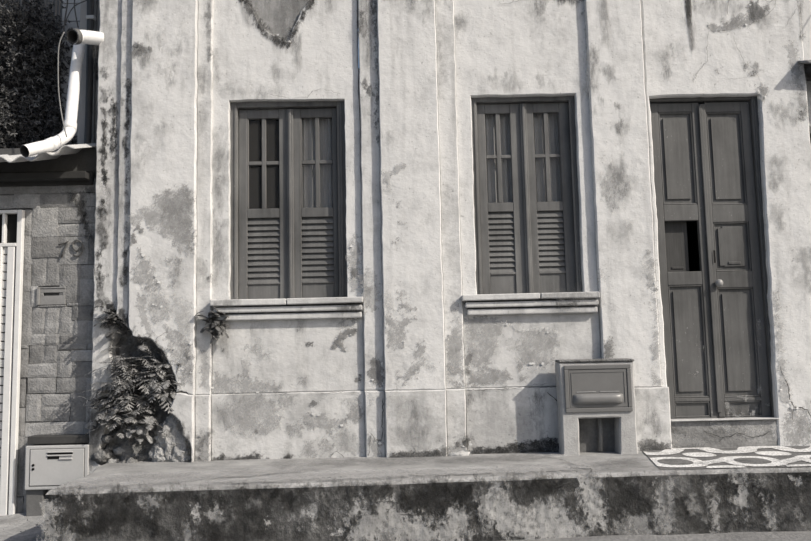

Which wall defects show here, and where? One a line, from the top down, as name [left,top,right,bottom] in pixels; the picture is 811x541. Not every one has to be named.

damp [685,0,694,49]
crack [702,1,798,102]
damp [99,78,131,186]
damp [69,194,174,386]
spalling [85,184,210,464]
peeling [331,318,358,351]
peeling [354,357,385,387]
peeling [385,291,417,349]
peeling [444,300,559,389]
crack [781,371,811,424]
damp [398,476,484,516]
damp [629,480,679,535]